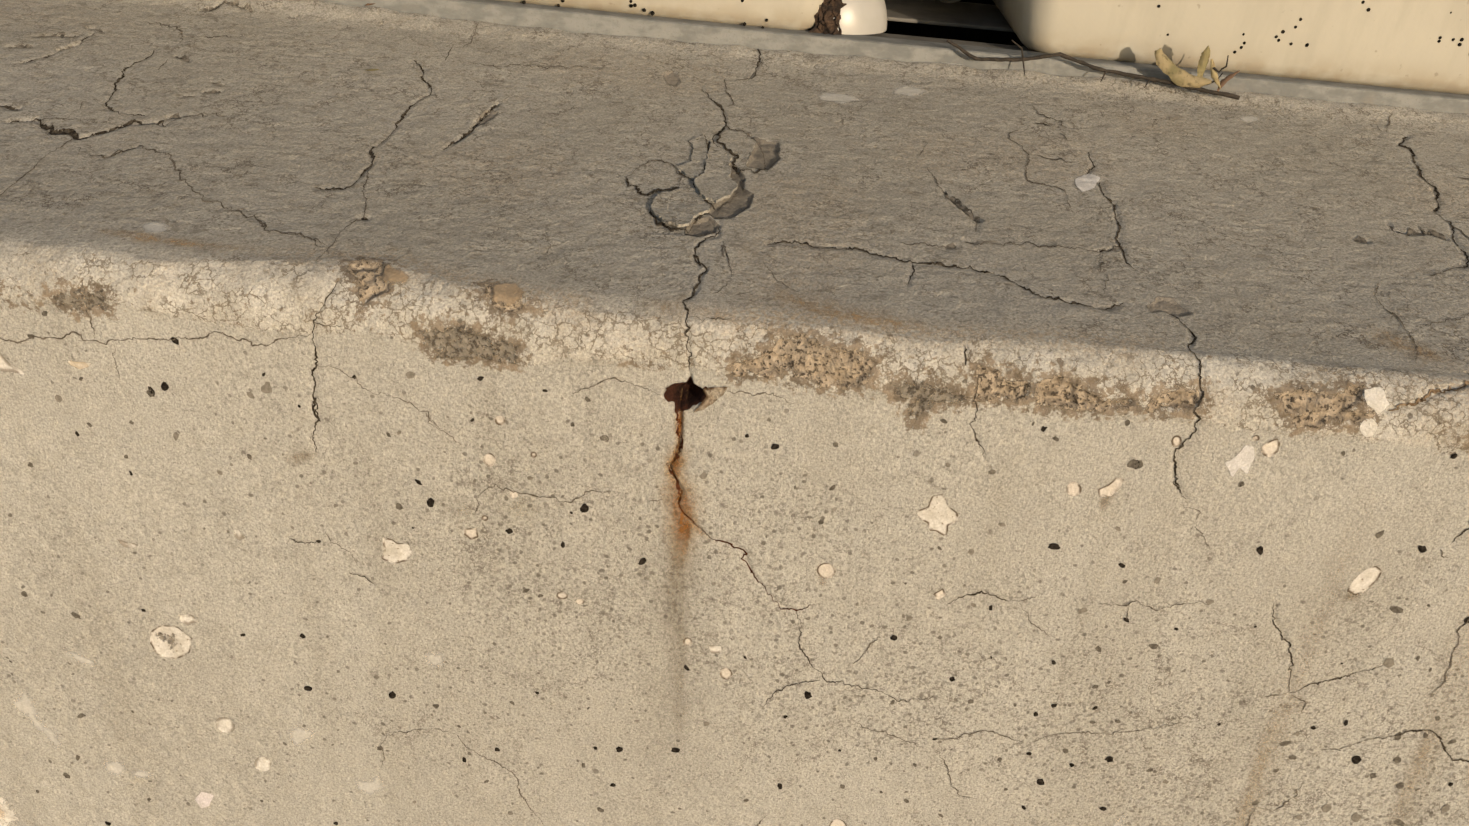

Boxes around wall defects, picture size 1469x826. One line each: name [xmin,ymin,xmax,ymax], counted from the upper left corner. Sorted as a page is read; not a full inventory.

crack [702,49,761,143]
spalling [53,288,107,313]
crack [0,22,603,451]
peeling [626,126,780,237]
crack [682,104,1134,369]
crack [1374,114,1469,364]
corrosion [671,406,690,540]
spalling [693,332,874,413]
crack [1173,315,1210,548]
crack [573,377,1187,798]
crack [1265,604,1381,712]
crack [1324,730,1469,762]